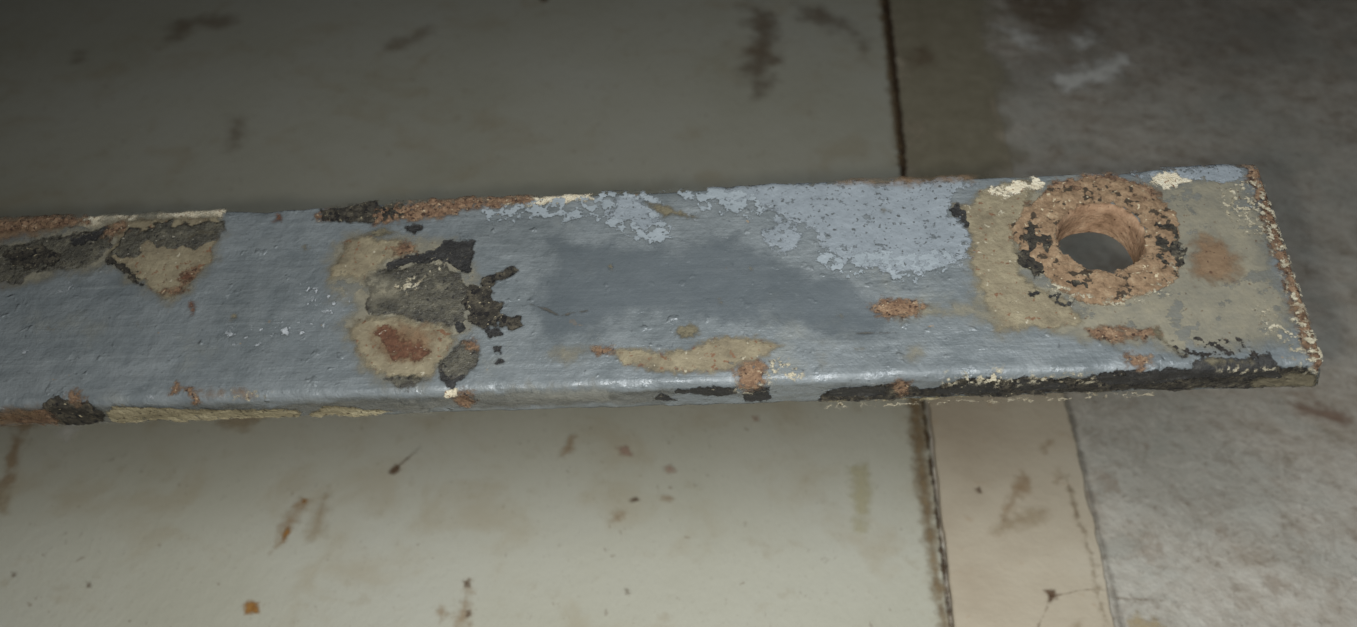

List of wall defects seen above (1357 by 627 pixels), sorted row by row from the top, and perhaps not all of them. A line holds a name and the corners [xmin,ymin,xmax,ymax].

corrosion [0,214,91,239]
peeling [0,212,226,302]
peeling [328,224,477,381]
corrosion [314,195,534,408]
peeling [481,164,1311,402]
corrosion [870,298,926,318]
corrosion [1008,172,1238,306]
corrosion [1086,325,1163,371]